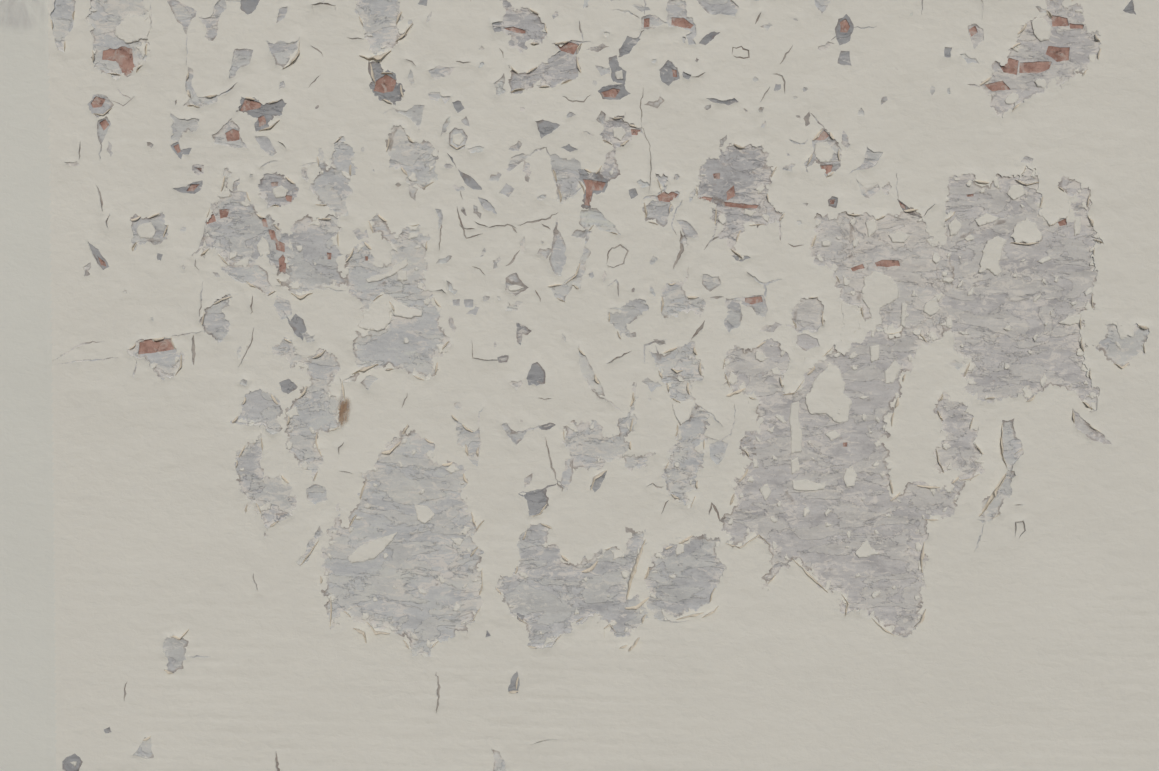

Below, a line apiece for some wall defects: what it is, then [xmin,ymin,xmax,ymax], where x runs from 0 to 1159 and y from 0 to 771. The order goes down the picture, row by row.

peeling [50,0,152,159]
peeling [84,242,109,276]
peeling [130,212,186,260]
peeling [53,282,233,380]
peeling [167,0,1149,657]
peeling [163,629,208,674]